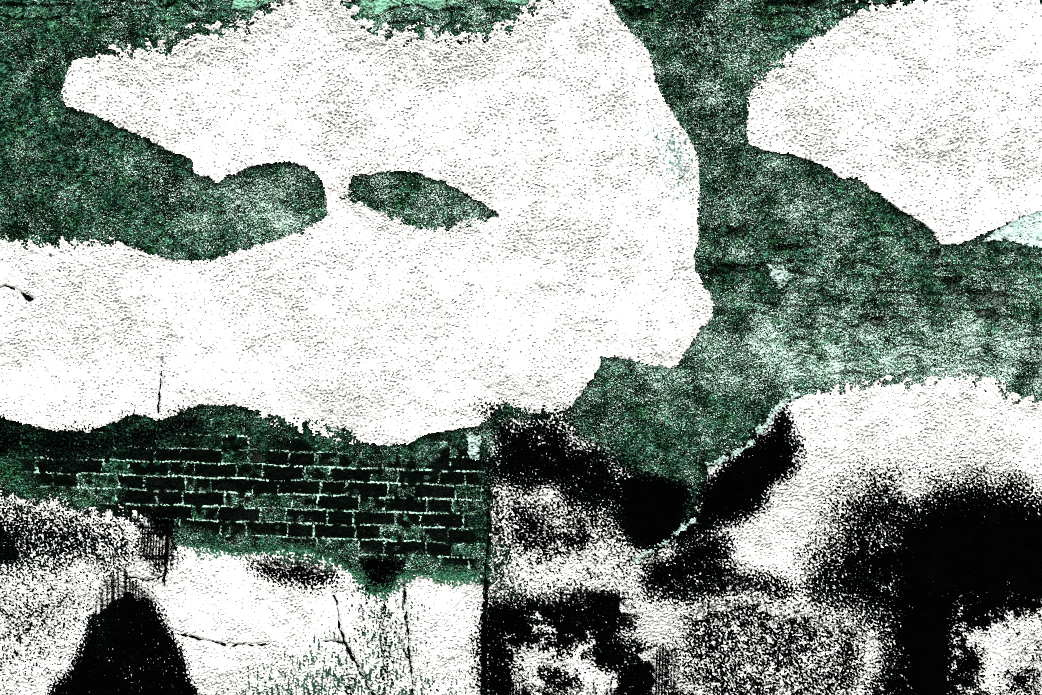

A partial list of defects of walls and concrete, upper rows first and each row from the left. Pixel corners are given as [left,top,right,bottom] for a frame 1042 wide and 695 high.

flaking render [340,0,555,45]
crack [0,285,34,301]
flaking render [0,0,328,264]
flaking render [340,171,499,232]
flaking render [492,0,1042,530]
flaking render [0,404,501,606]